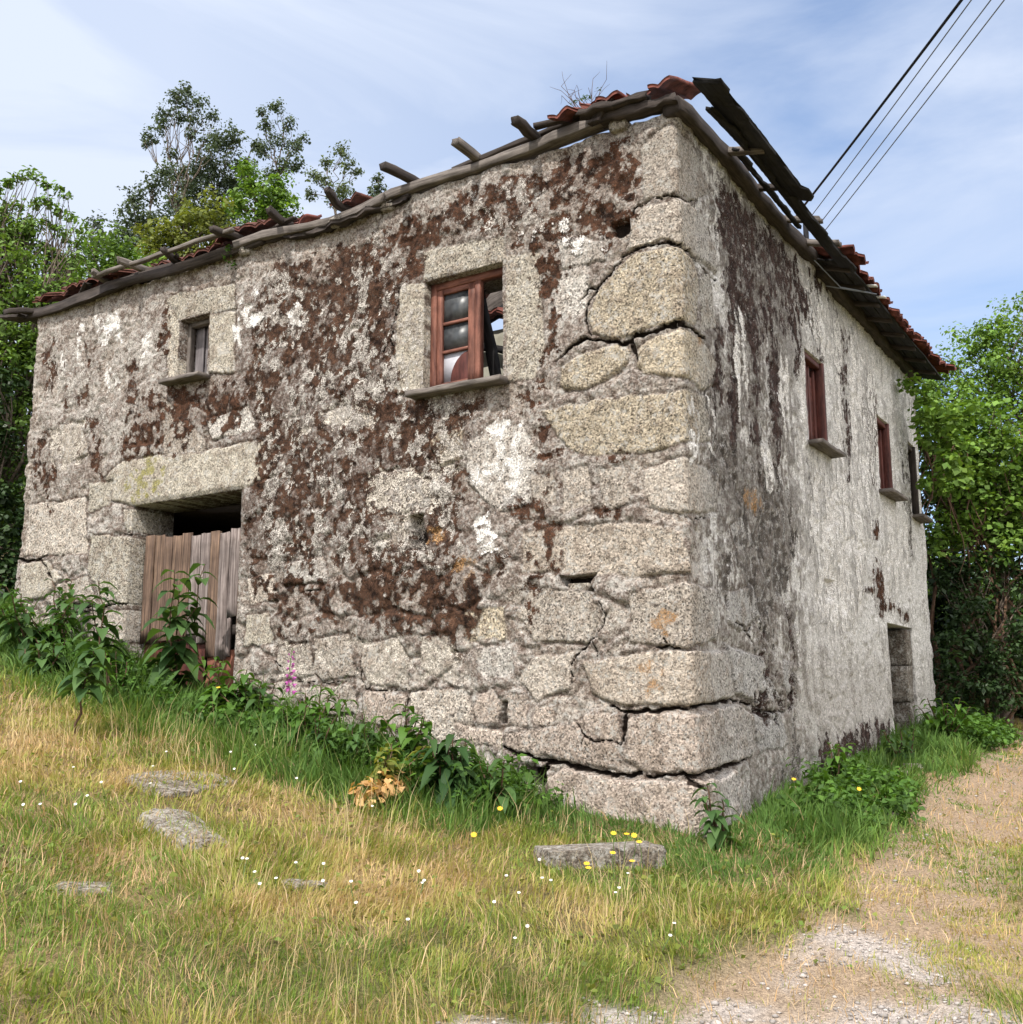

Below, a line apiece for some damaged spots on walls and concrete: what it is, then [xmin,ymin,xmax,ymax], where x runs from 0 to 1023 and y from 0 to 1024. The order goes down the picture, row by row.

crack [556,240,716,362]
water stain [120,136,653,665]
water stain [704,171,880,651]
crack [571,601,606,683]
crack [656,638,681,649]
crack [504,698,783,791]
water stain [818,717,890,772]